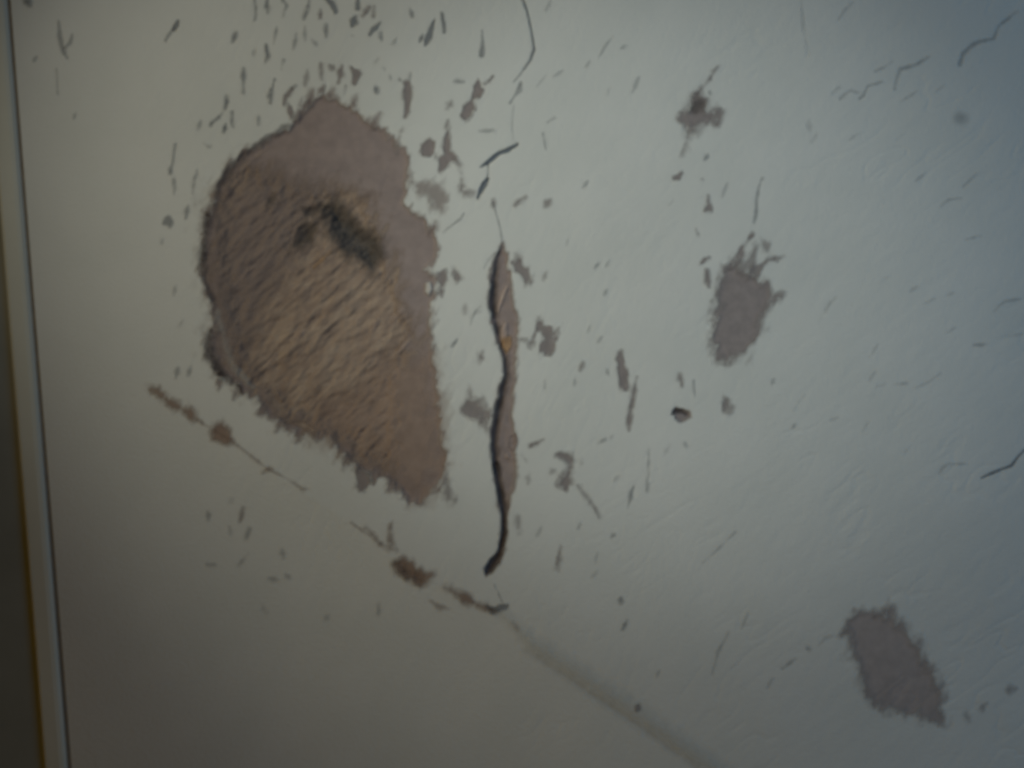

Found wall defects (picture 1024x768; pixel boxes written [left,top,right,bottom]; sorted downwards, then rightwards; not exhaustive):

peeling [337,66,361,85]
crack [518,0,535,89]
spalling [201,81,460,505]
peeling [530,321,557,356]
peeling [700,234,782,364]
crack [485,243,519,574]
peeling [672,408,691,422]
peeling [846,607,944,724]